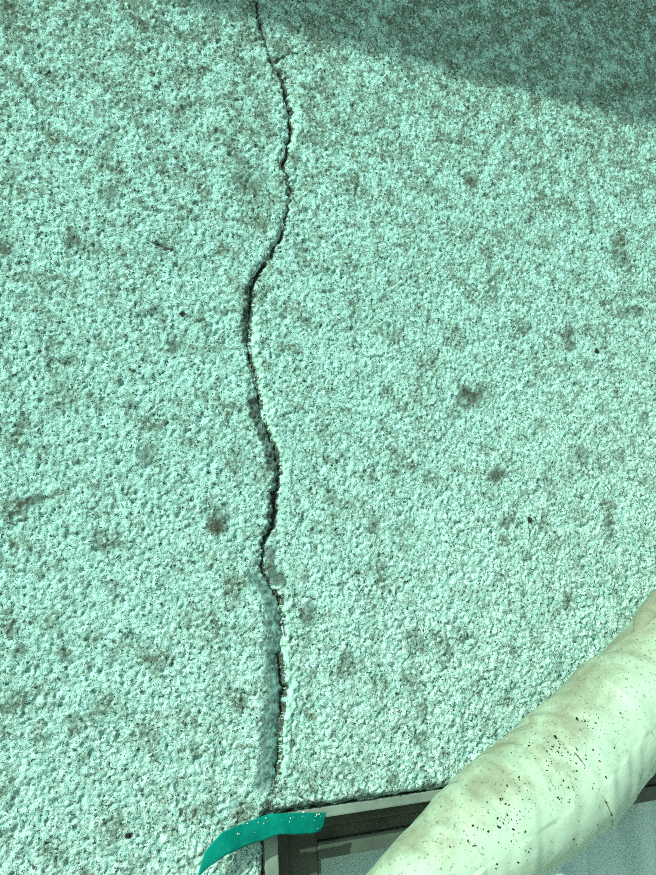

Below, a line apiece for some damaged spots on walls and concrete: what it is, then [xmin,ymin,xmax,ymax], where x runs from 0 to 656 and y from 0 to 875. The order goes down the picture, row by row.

crack [240,2,318,810]